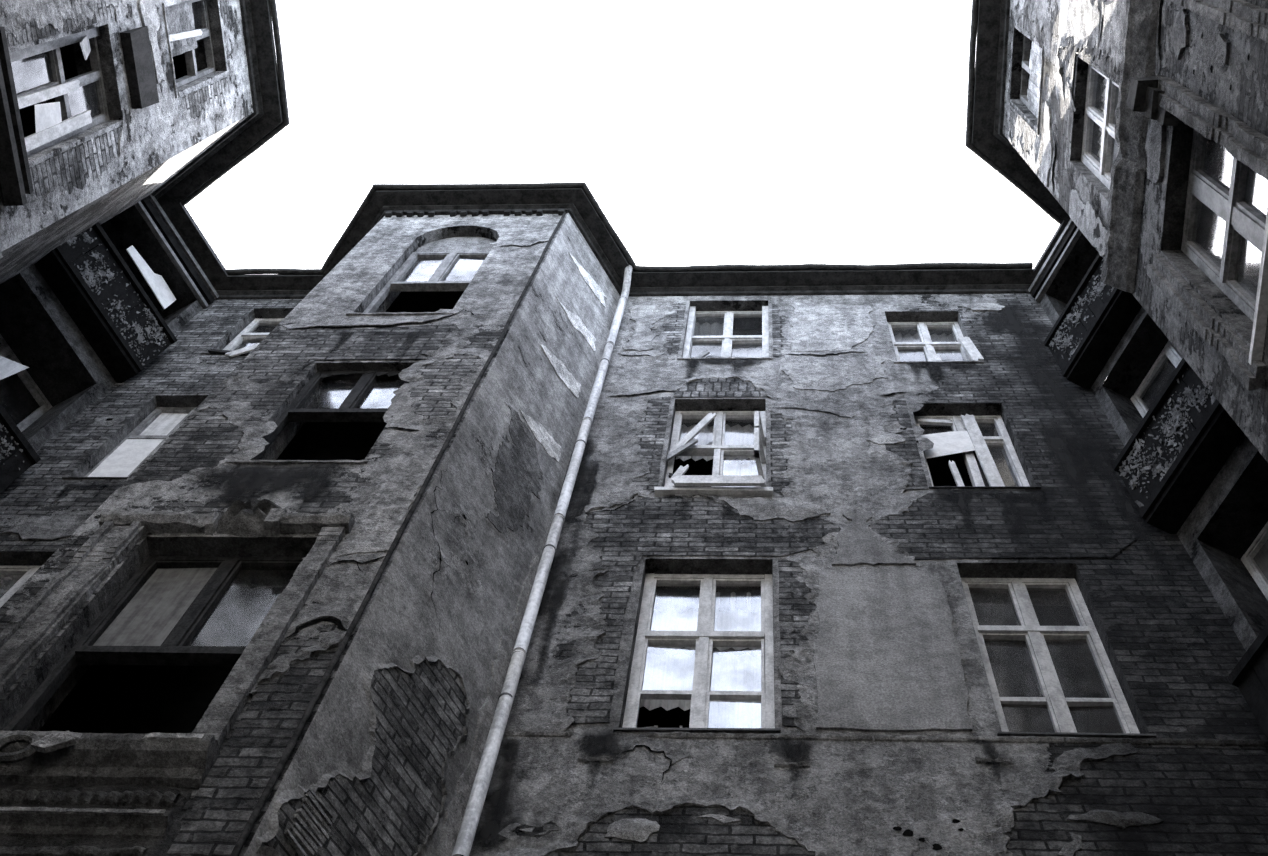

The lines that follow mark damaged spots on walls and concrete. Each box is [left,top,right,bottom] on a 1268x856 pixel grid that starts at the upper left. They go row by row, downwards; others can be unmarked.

spalling [1011,0,1120,112]
spalling [1007,94,1040,166]
spalling [110,321,492,498]
crack [606,351,676,396]
crack [772,387,907,418]
peeling [1119,375,1216,507]
spalling [544,374,1138,734]
spalling [166,628,470,856]
spalling [469,791,836,856]
crack [613,726,695,785]
spalling [860,743,1268,856]